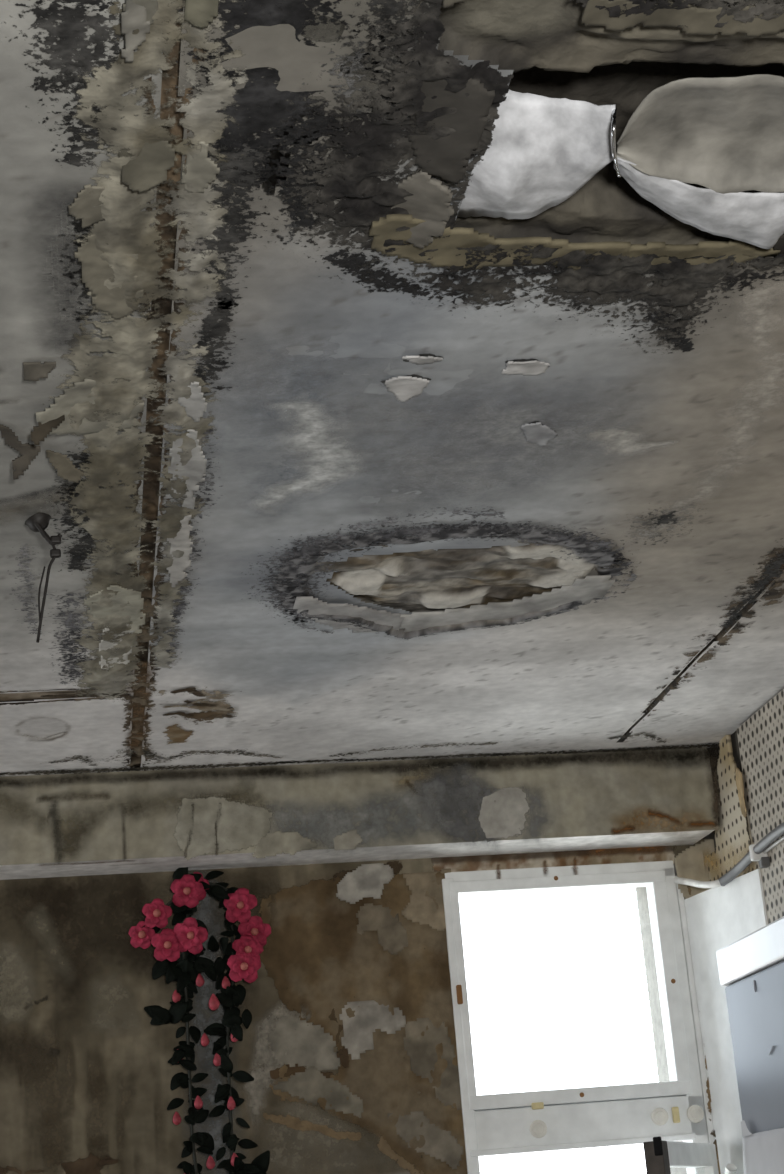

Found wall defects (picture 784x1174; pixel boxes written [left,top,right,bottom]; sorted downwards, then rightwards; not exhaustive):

damp [5,0,125,167]
spalling [359,0,784,270]
crack [0,6,206,771]
peeling [381,353,443,402]
damp [171,0,784,634]
damp [0,451,108,685]
crack [618,545,784,741]
peeling [173,796,318,861]
damp [0,732,720,862]
peeling [478,787,530,839]
damp [0,876,271,1174]
spalling [245,861,468,1174]